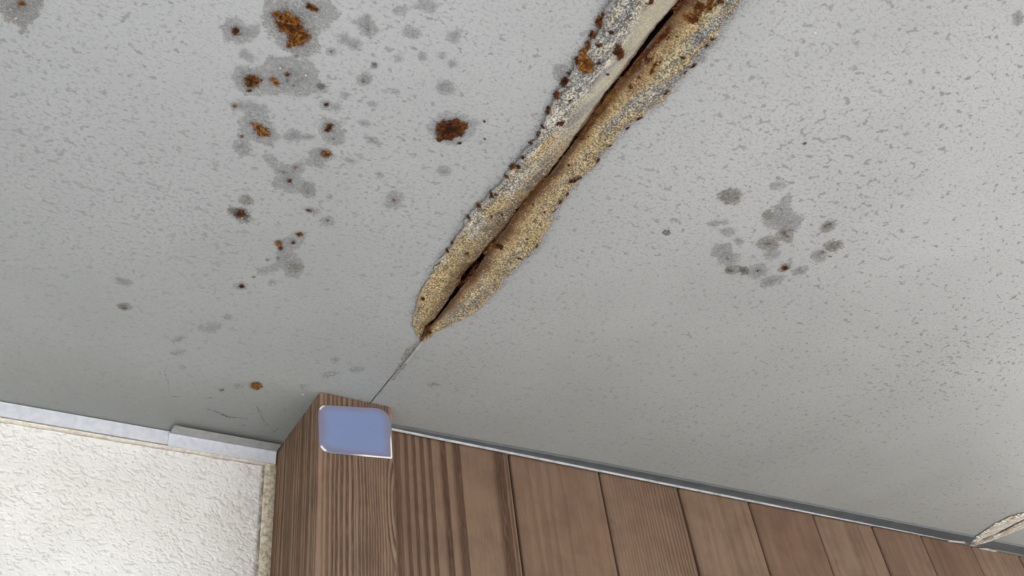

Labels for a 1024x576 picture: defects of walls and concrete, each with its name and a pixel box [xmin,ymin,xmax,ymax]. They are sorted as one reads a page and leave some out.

water stain [330,15,378,55]
corrosion [219,0,344,198]
water stain [357,63,377,86]
corrosion [504,0,725,179]
corrosion [428,113,486,145]
corrosion [227,206,251,224]
water stain [233,232,305,290]
corrosion [455,164,582,288]
crack [371,0,688,402]
water stain [711,177,844,289]
peeling [948,513,1024,552]